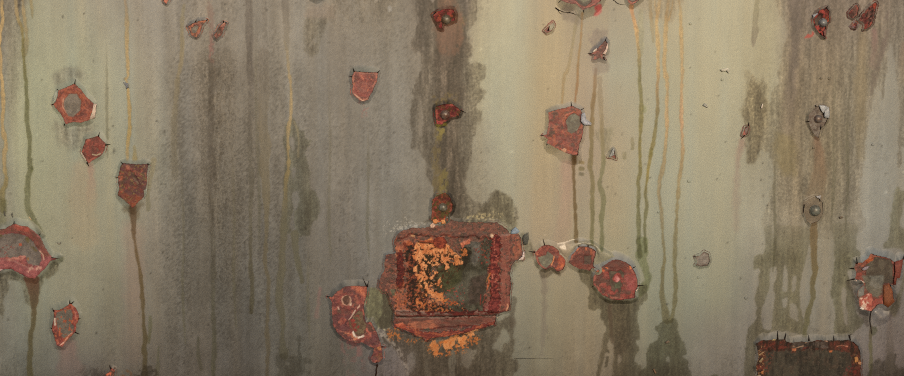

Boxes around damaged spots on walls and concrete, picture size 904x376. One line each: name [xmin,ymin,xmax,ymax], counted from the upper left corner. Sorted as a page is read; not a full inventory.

peeling [0,211,63,284]
damp [0,254,65,376]
damp [48,42,110,159]
peeling [50,78,110,167]
peeling [115,158,152,215]
damp [170,0,562,376]
corrosion [376,0,578,360]
peeling [325,189,644,366]
peeling [540,101,591,165]
damp [559,9,616,247]
corrosion [754,339,863,376]
damp [737,0,904,376]